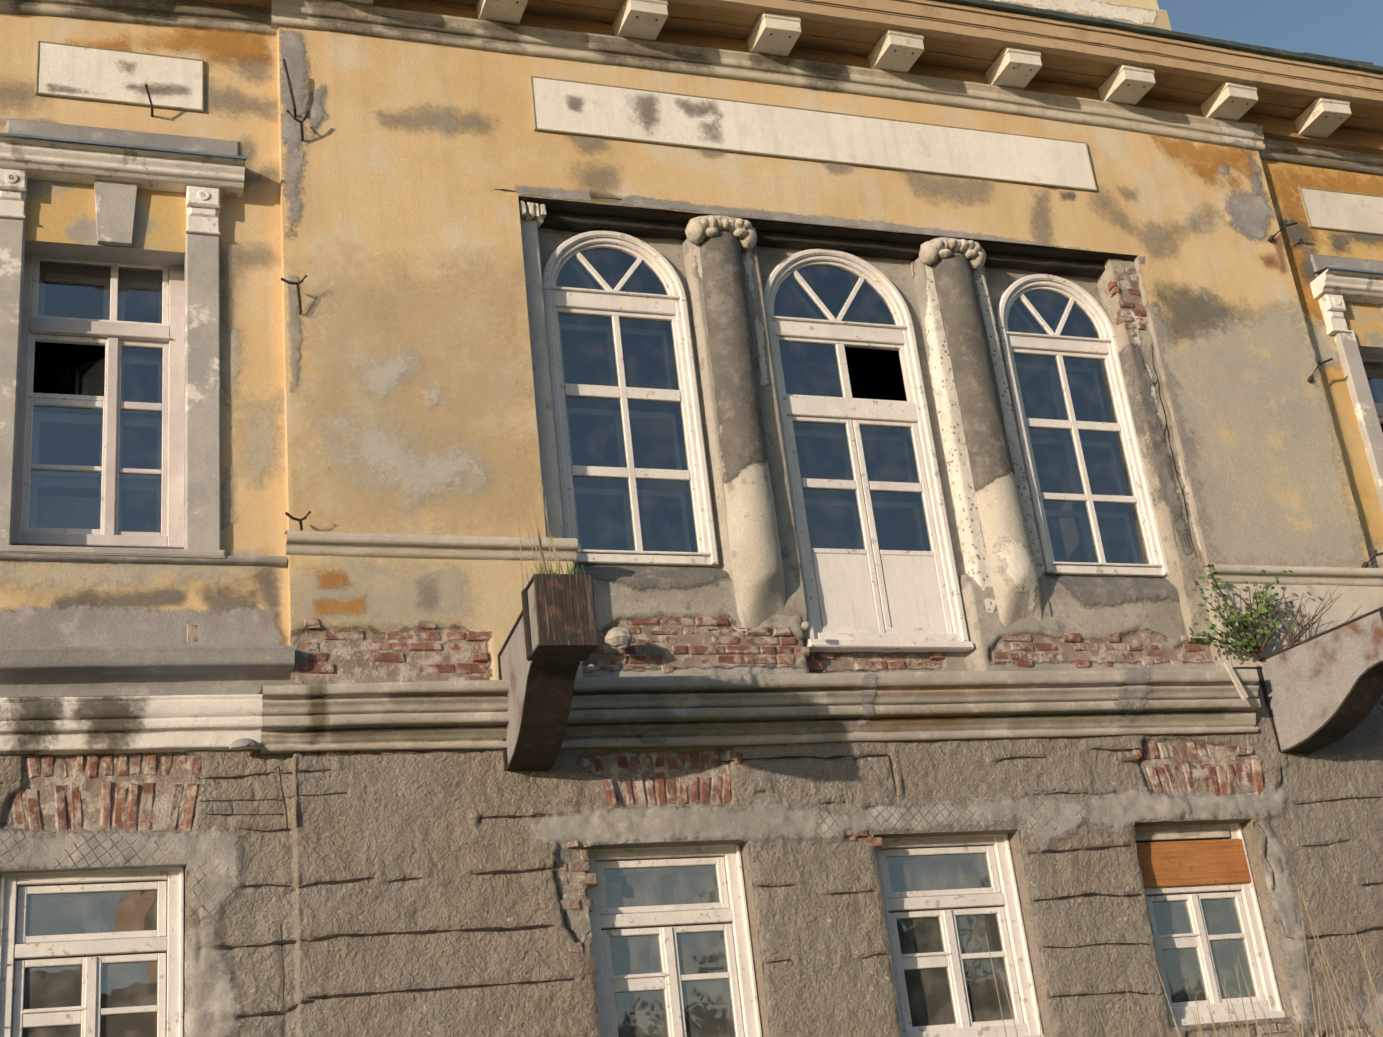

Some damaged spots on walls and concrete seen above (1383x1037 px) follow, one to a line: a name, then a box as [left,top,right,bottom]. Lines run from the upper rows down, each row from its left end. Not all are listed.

spalling [619,195,1084,250]
damp [1154,285,1246,340]
flaking render [1107,118,1383,568]
peeling [910,261,1045,615]
flaking render [290,570,492,685]
flaking render [582,614,945,673]
damp [7,696,145,756]
crack [200,767,347,832]
crack [241,877,422,891]
crack [473,867,556,875]
crack [1258,824,1383,939]
crack [197,912,574,1033]